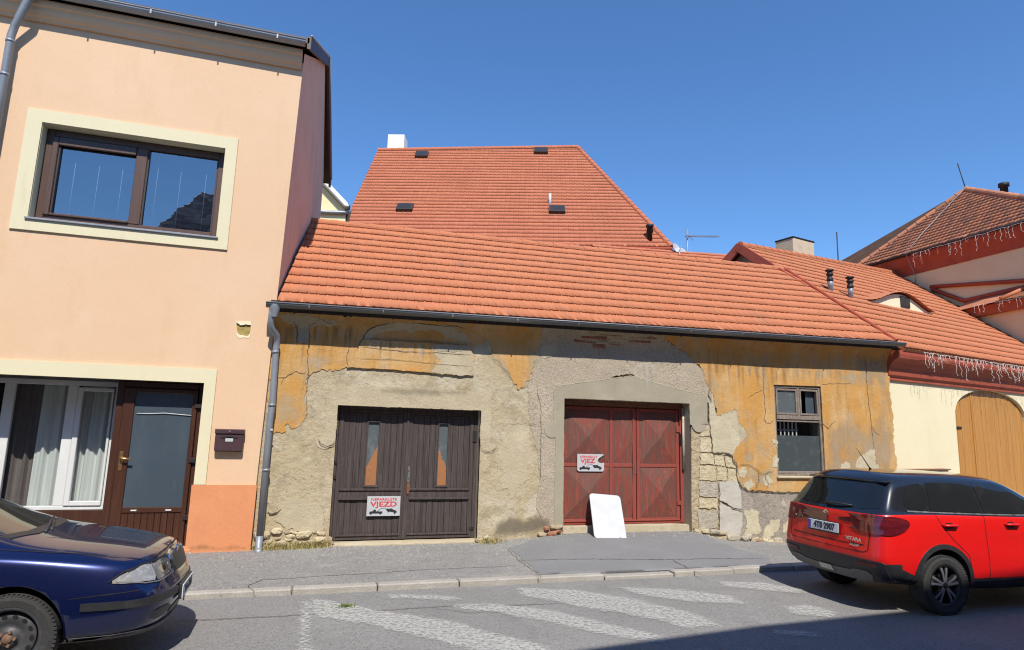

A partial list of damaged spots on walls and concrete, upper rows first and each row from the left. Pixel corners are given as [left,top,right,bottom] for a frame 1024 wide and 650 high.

crack [277,319,331,409]
peeling [279,314,345,343]
spalling [251,322,799,550]